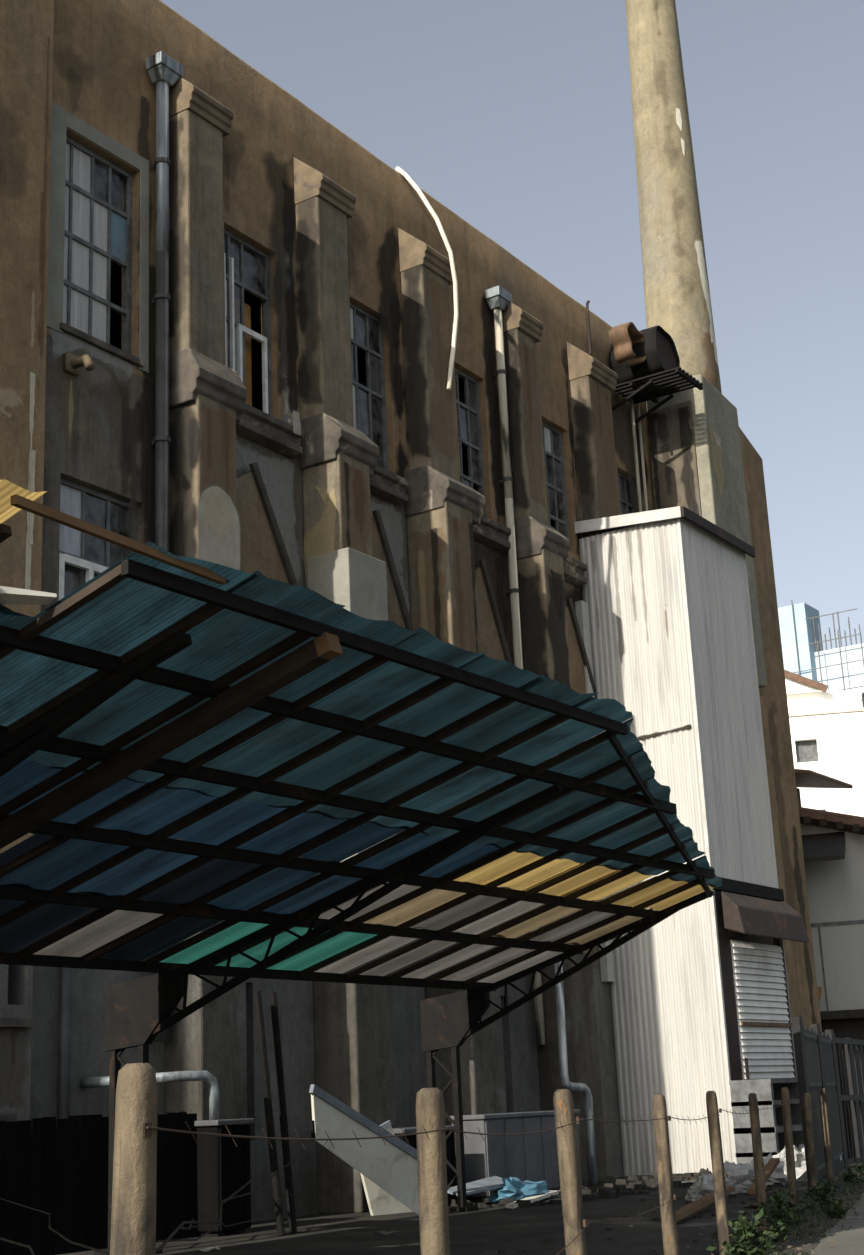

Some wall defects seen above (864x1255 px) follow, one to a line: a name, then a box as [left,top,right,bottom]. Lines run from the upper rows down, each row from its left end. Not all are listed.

spalling [676,108,685,156]
leakage [274,181,310,412]
peeling [695,241,718,365]
leakage [392,296,426,445]
leakage [398,443,406,478]
leakage [636,414,672,510]